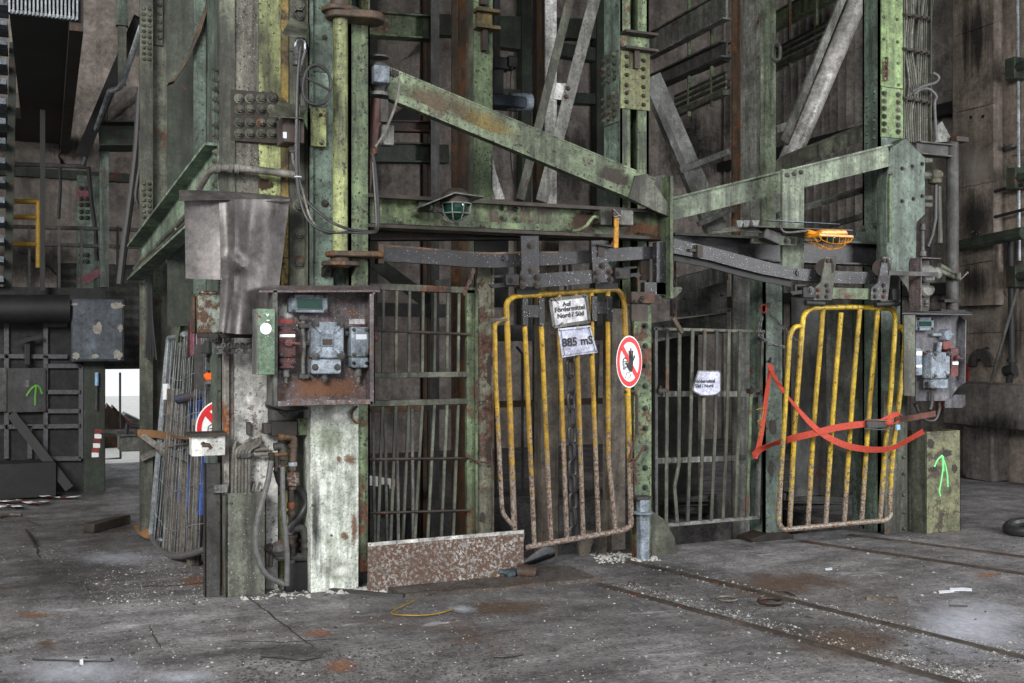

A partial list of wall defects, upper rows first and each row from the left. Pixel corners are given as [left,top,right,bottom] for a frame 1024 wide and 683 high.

rust [412,0,470,143]
rust [601,166,628,185]
rust [288,377,365,400]
rust [458,267,467,535]
rust [341,515,357,542]
crack [246,595,346,648]